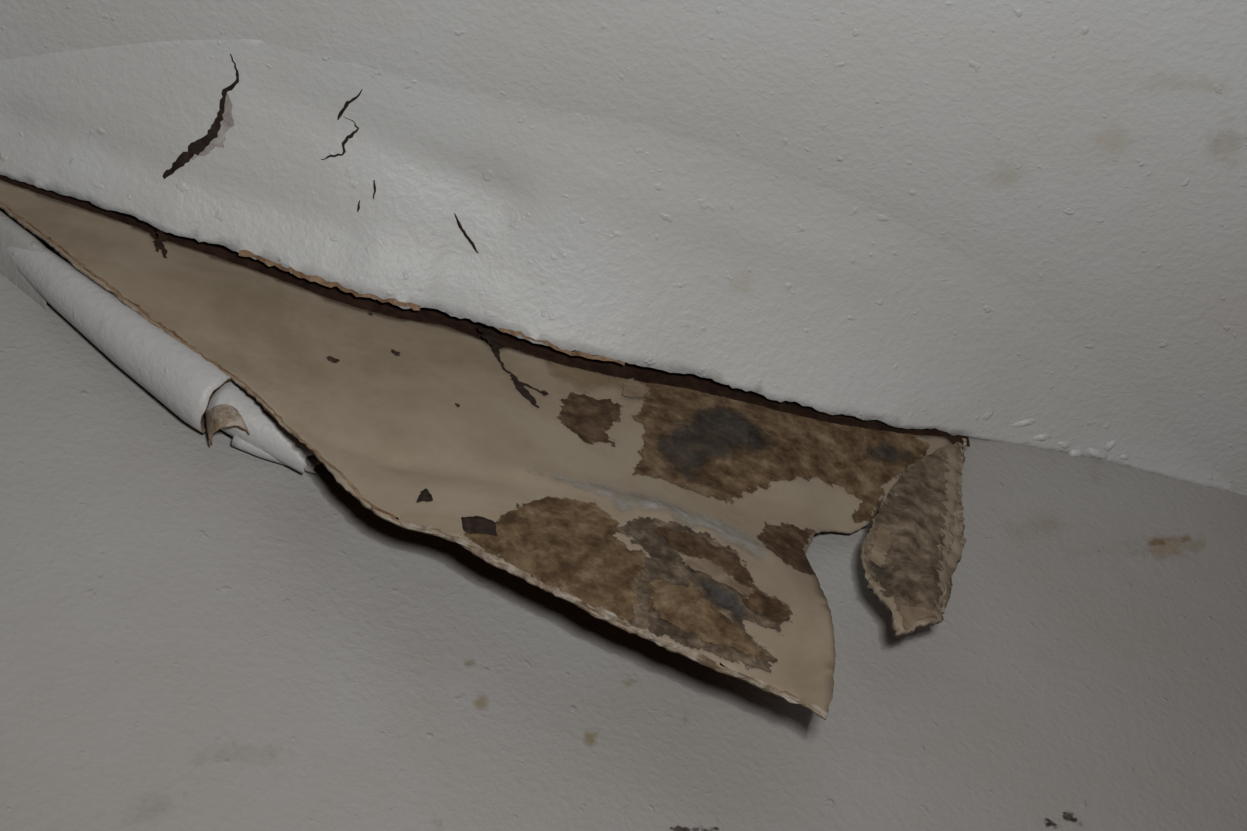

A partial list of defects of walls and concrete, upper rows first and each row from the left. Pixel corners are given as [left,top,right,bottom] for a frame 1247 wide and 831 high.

crack [162,54,239,179]
crack [321,89,363,160]
flaking render [0,180,967,720]
water stain [464,496,793,672]
water stain [550,363,950,629]